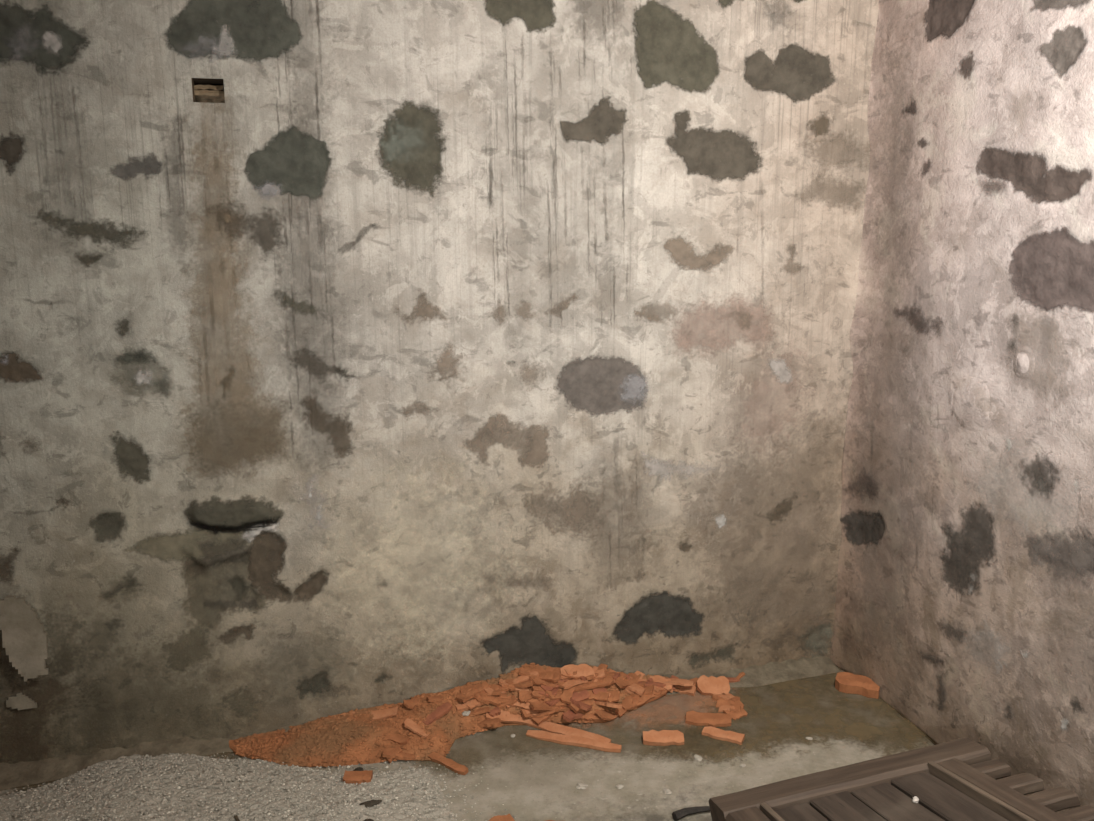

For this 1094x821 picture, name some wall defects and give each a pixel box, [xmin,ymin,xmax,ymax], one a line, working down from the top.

flaking render [165,0,302,60]
flaking render [485,0,556,31]
flaking render [633,0,720,92]
flaking render [744,44,835,102]
flaking render [1040,25,1088,77]
flaking render [245,126,331,199]
flaking render [378,101,446,197]
flaking render [667,110,761,181]
flaking render [1009,227,1094,312]
flaking render [556,357,648,415]
flaking render [130,495,329,634]
flaking render [613,591,704,644]